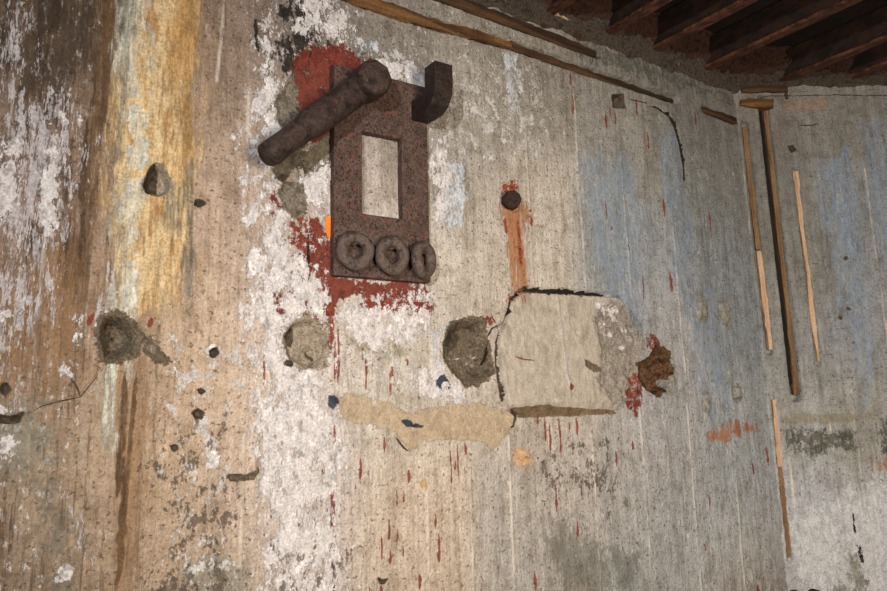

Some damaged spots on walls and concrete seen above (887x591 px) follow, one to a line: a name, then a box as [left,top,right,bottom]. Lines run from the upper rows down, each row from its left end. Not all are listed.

leakage [0,0,203,379]
spalling [140,160,176,199]
crack [630,99,686,181]
peeling [265,131,435,373]
corrosion [499,180,533,302]
leakage [0,386,28,463]
crack [34,369,103,411]
spalling [87,308,172,366]
spalling [435,314,497,390]
spalling [592,298,678,420]